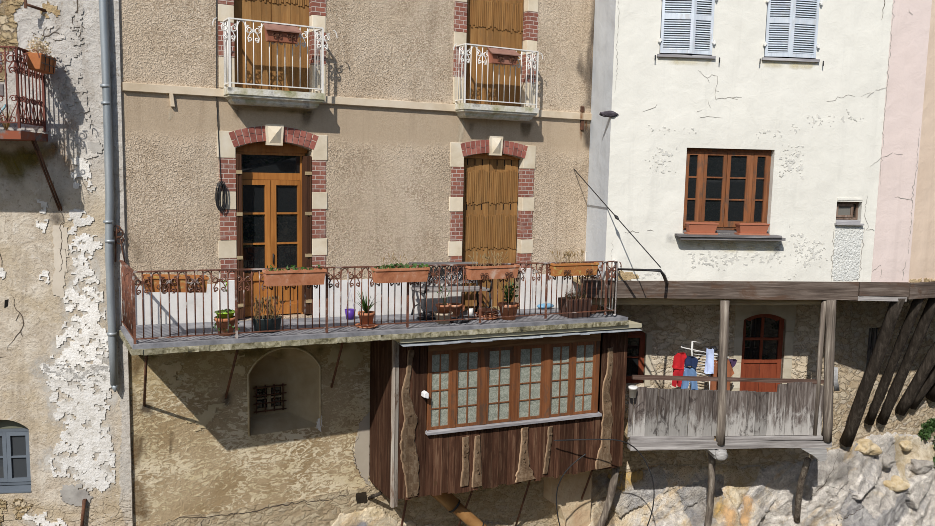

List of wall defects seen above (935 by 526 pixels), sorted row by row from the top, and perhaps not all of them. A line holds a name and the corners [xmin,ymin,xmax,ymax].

flaking render [0,0,24,82]
flaking render [34,1,65,43]
crack [697,70,742,118]
leakage [0,147,53,178]
crack [833,0,920,280]
flaking render [34,208,118,493]